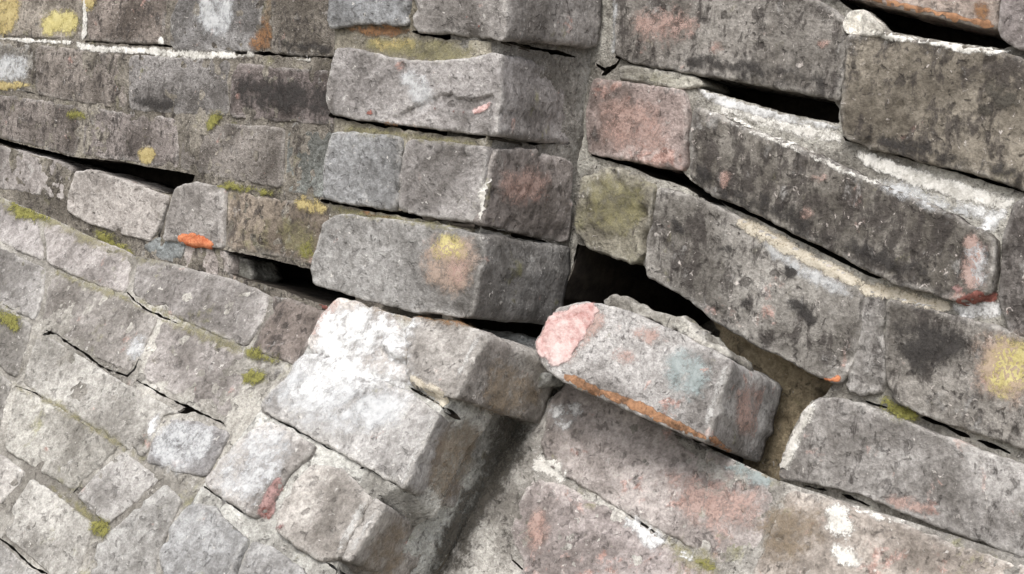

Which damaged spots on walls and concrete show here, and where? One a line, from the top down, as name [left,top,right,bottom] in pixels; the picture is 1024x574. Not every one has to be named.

crack [128,293,179,324]
crack [46,331,224,424]